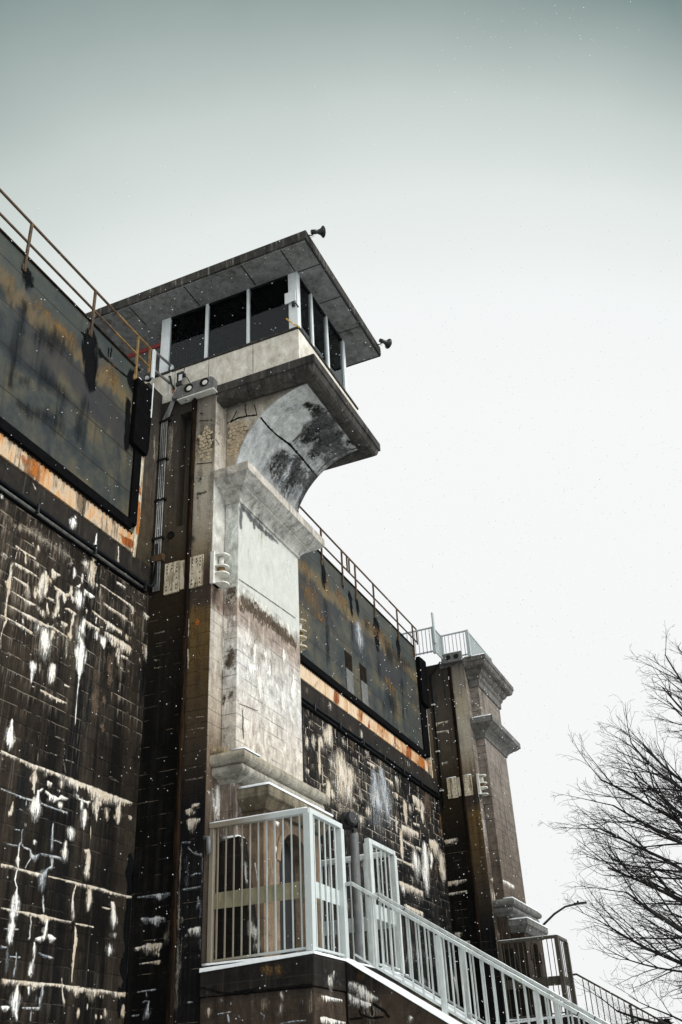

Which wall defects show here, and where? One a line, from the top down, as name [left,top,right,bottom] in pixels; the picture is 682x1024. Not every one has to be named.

corrosion [22,455,41,480]
corrosion [120,487,141,548]
crack [197,404,357,478]
damp [272,414,352,498]
damp [1,558,149,732]
damp [212,587,297,716]
damp [1,719,168,1020]
damp [305,721,467,897]